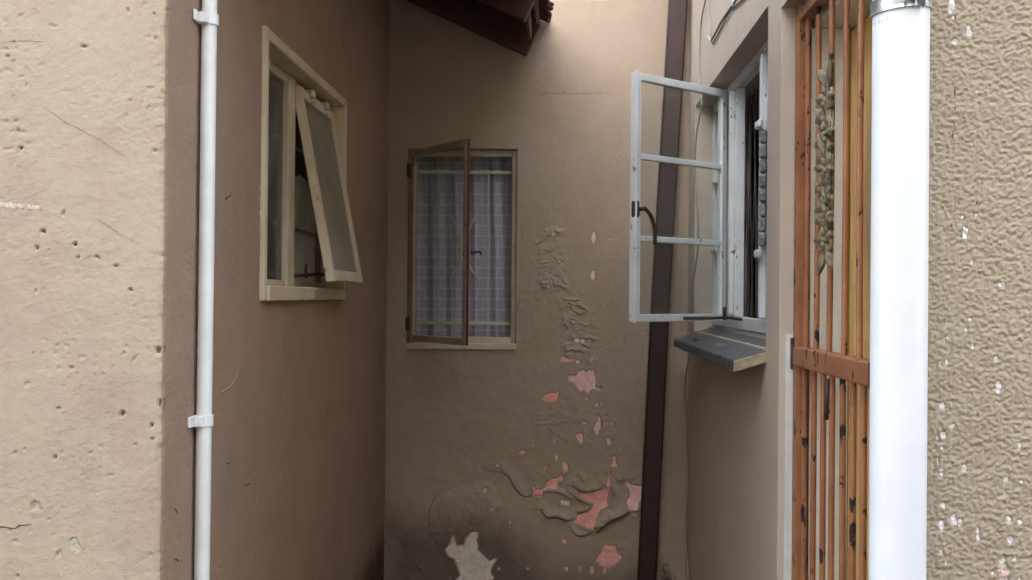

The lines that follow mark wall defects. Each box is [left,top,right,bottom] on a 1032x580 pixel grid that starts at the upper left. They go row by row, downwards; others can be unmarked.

peeling [532,348,622,533]
peeling [625,480,642,516]
peeling [446,532,500,580]
peeling [565,545,622,574]